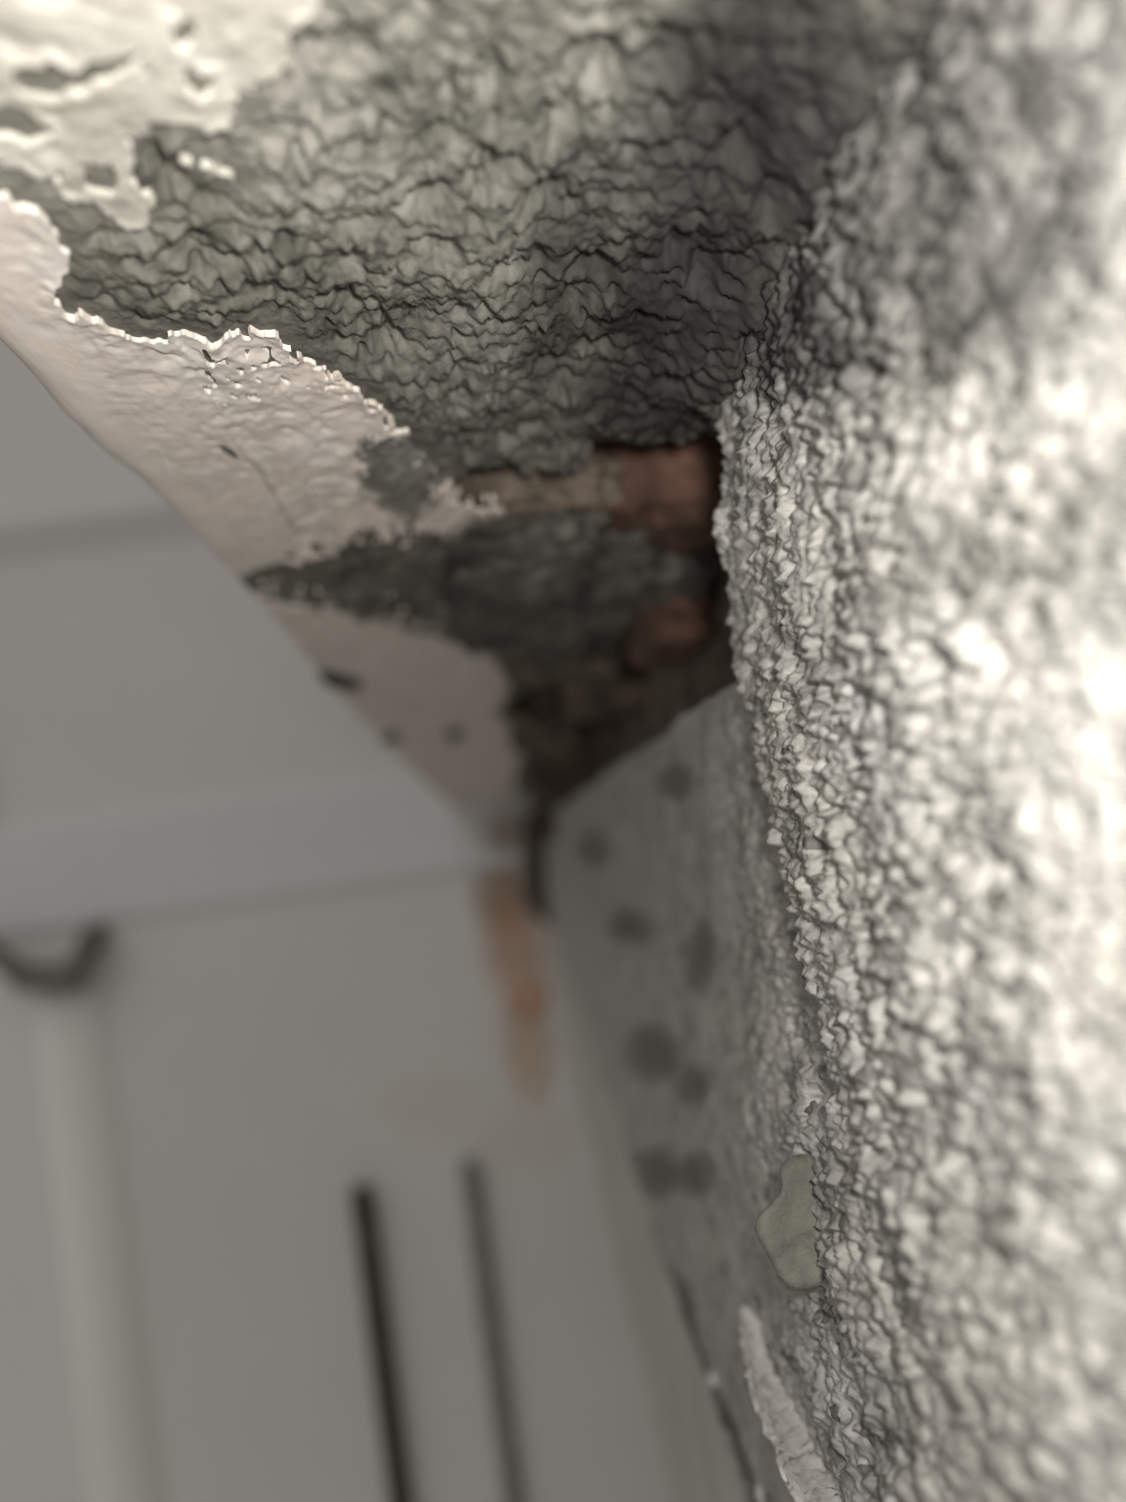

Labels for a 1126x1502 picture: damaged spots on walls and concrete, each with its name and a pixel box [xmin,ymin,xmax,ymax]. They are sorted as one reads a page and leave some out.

peeling [0,0,321,231]
spalling [0,189,738,840]